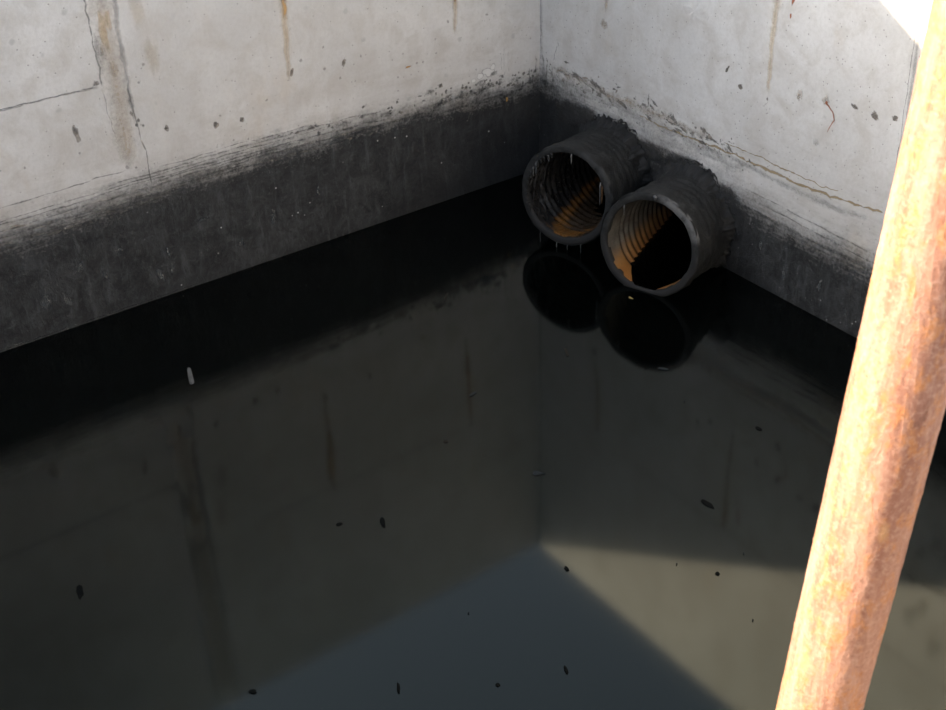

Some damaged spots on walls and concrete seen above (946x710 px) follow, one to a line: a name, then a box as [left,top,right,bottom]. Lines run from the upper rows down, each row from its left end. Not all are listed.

crack [0,0,102,110]
crack [128,90,151,180]
damp [0,69,705,353]
damp [640,115,883,213]
damp [716,181,873,339]